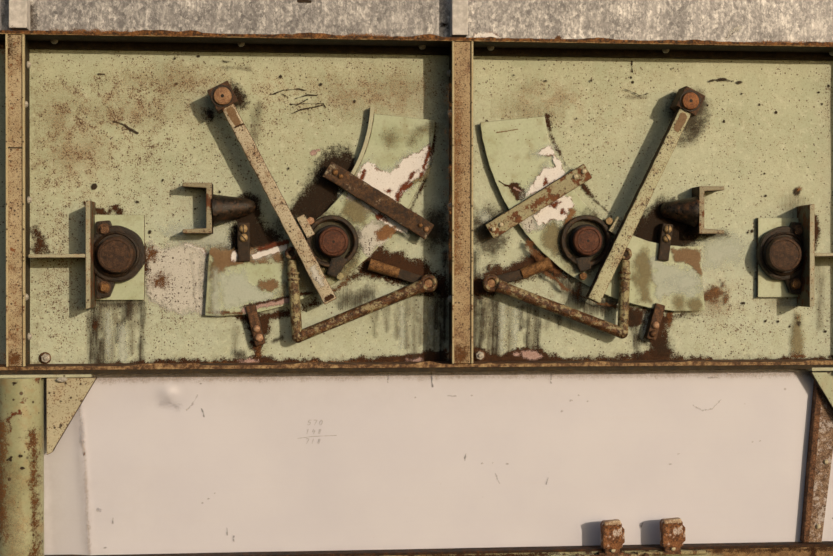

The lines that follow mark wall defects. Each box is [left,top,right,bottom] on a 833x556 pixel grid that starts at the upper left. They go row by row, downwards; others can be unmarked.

corrosion [0,25,833,69]
corrosion [301,84,467,326]
peeling [356,143,432,202]
peeling [499,144,565,201]
peeling [521,195,576,233]
corrosion [545,113,572,171]
corrosion [99,304,731,369]
damp [473,292,541,357]
corrosion [473,240,618,314]
corrosion [704,281,730,304]
corrosion [0,409,22,544]
corrosion [25,427,43,556]